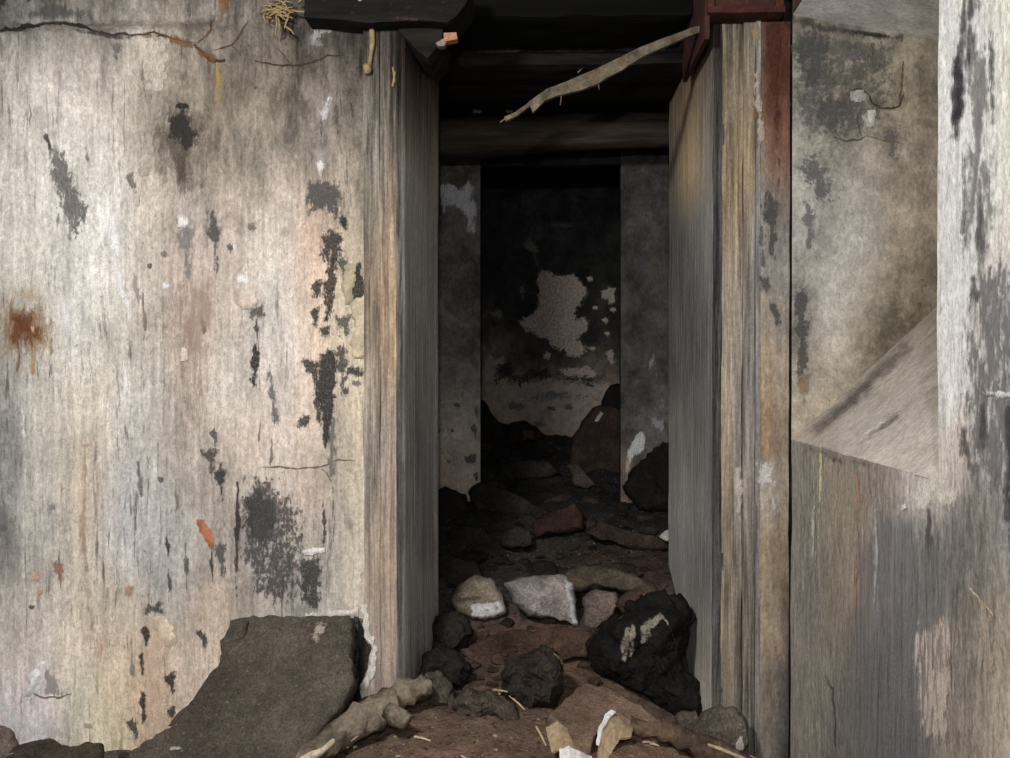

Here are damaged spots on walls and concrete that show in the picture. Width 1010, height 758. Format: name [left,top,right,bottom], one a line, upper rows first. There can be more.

crack [0,19,343,67]
crack [848,48,904,110]
crack [834,135,904,144]
rust [3,305,53,374]
peeling [341,263,364,358]
peeling [519,238,616,380]
damp [969,275,982,308]
damp [957,404,987,479]